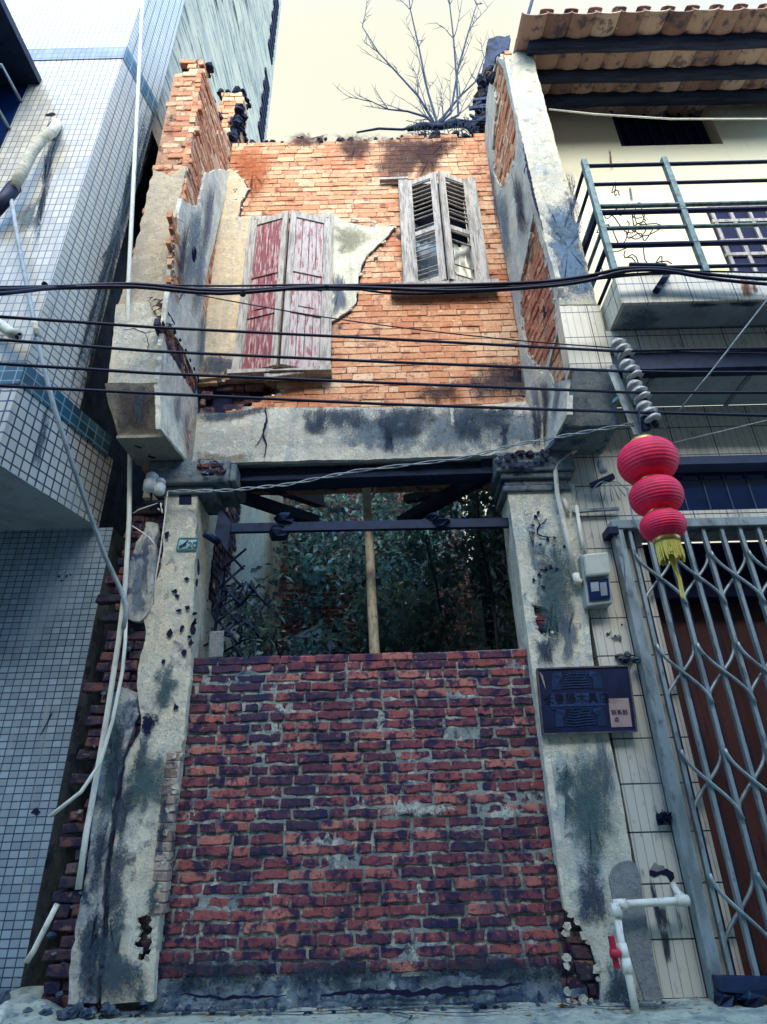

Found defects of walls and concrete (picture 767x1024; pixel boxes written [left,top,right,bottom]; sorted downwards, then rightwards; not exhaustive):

spalling [492,54,516,188]
spalling [148,211,291,418]
spalling [519,216,558,372]
crack [255,406,268,456]
damp [303,381,558,452]
damp [528,525,578,663]
spalling [133,747,184,967]
damp [77,666,287,1015]
damp [555,741,616,923]
crack [180,983,524,1024]
spalling [557,911,602,1003]
damp [603,962,680,1009]